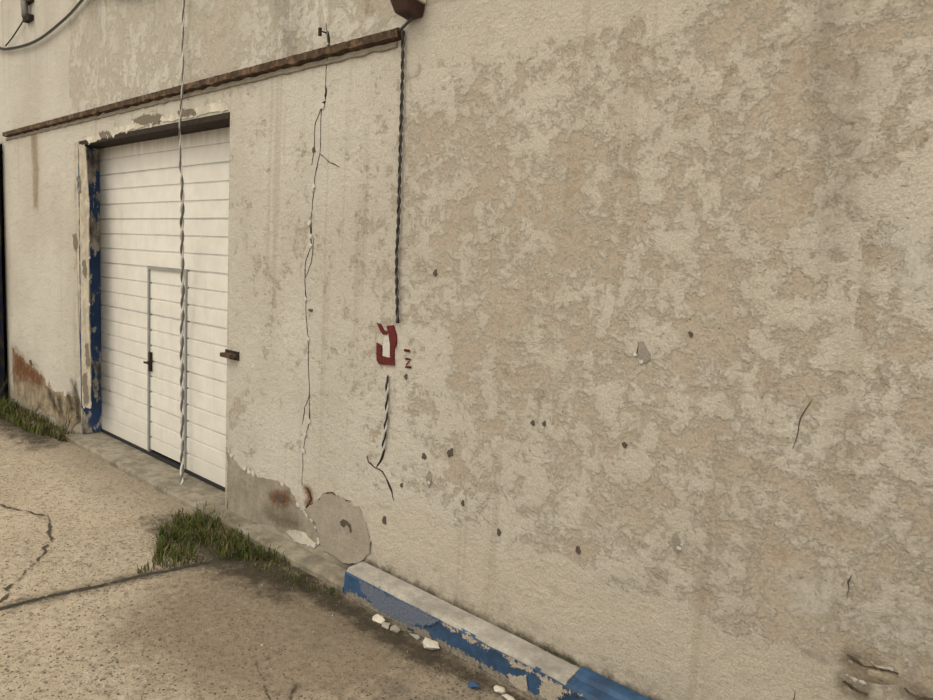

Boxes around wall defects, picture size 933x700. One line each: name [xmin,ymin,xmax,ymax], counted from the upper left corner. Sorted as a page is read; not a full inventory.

peeling [12,99,228,427]
crack [301,4,339,472]
rust [13,349,42,385]
flaking render [226,447,320,548]
crack [0,504,54,602]
crack [254,658,296,700]
peeling [359,581,583,700]